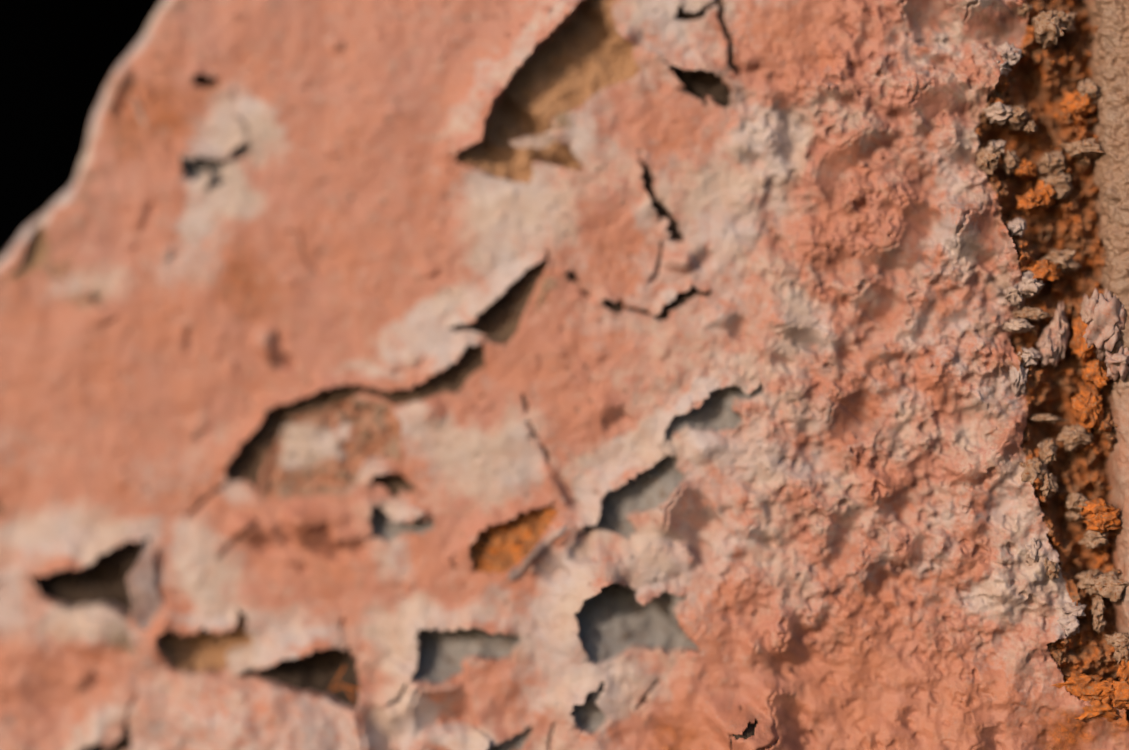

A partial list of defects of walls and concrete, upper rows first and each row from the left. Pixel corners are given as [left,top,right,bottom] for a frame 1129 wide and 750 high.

crack [704,0,740,74]
peeling [434,0,731,183]
peeling [167,132,252,192]
crack [651,241,663,283]
crack [625,307,656,316]
peeling [208,249,580,542]
peeling [442,371,763,665]
peeling [5,527,362,709]
peeling [388,596,522,685]
peeling [52,715,132,750]
peeling [549,679,607,734]
corrosion [1097,711,1129,734]